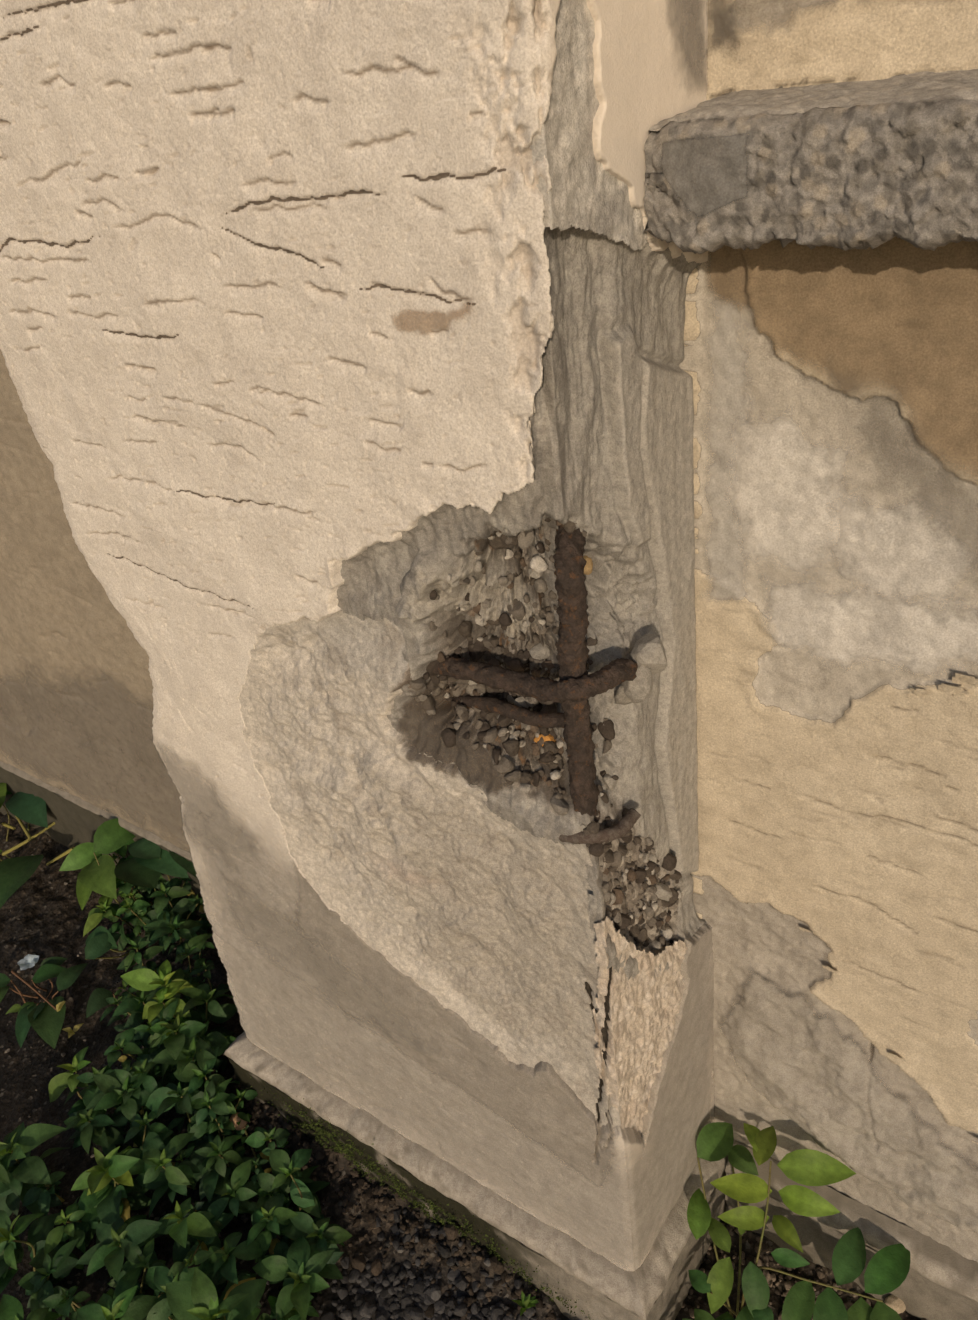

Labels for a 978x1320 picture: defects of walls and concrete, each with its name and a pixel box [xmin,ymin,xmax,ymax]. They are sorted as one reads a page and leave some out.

crack [1,0,87,40]
crack [0,236,100,252]
crack [102,329,179,339]
crack [222,167,506,268]
crack [360,283,476,305]
spalling [238,0,978,1262]
corrosion [398,682,509,793]
crack [585,966,612,1139]